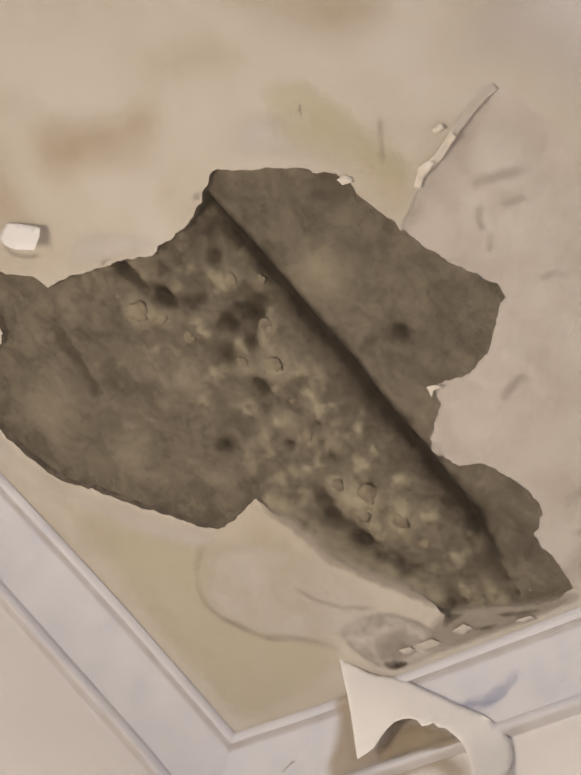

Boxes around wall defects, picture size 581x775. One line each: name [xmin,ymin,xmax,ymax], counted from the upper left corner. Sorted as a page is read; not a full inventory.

spalling [0,83,581,617]
peeling [399,639,442,656]
peeling [453,624,473,635]
peeling [340,659,513,775]